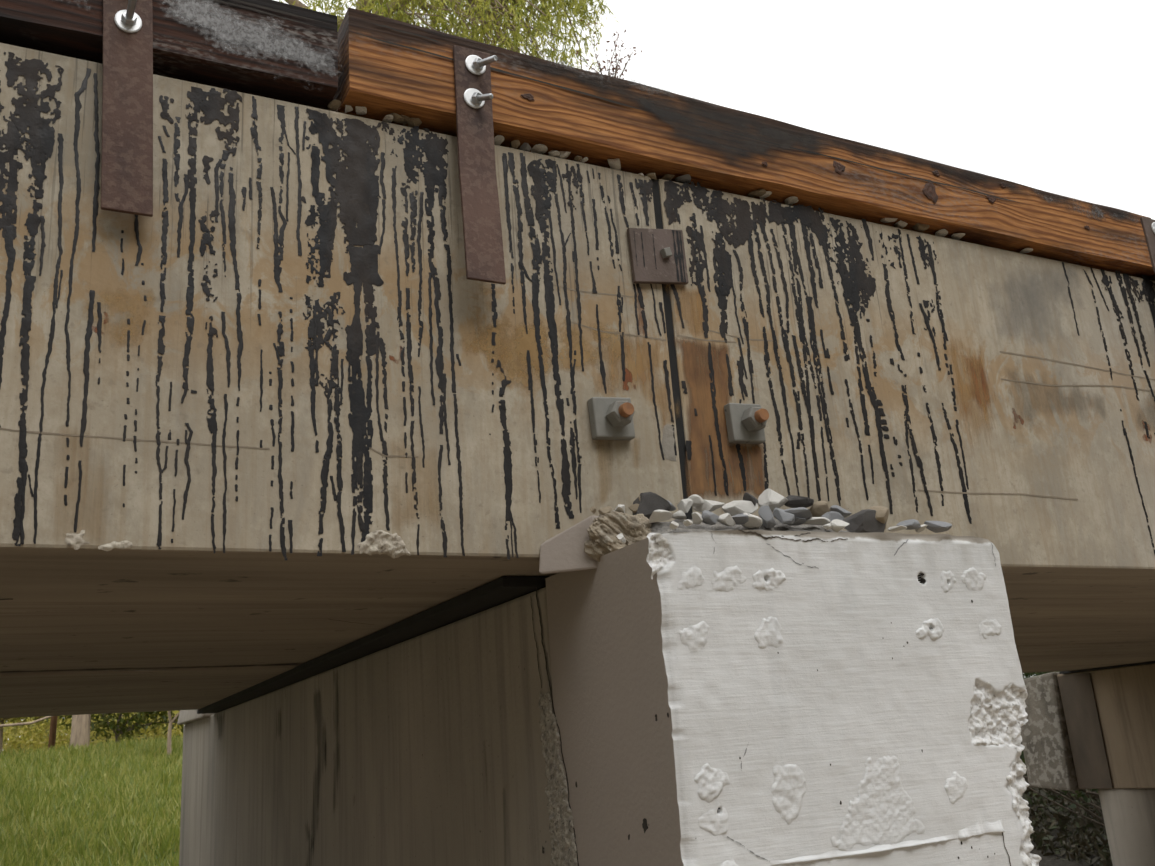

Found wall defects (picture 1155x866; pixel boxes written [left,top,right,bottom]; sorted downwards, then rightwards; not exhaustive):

corrosion [610,320,651,390]
corrosion [966,359,990,407]
spalling [65,530,132,551]
spalling [357,530,411,558]
spalling [584,511,676,579]
crack [531,587,579,866]
spalling [968,682,1041,866]